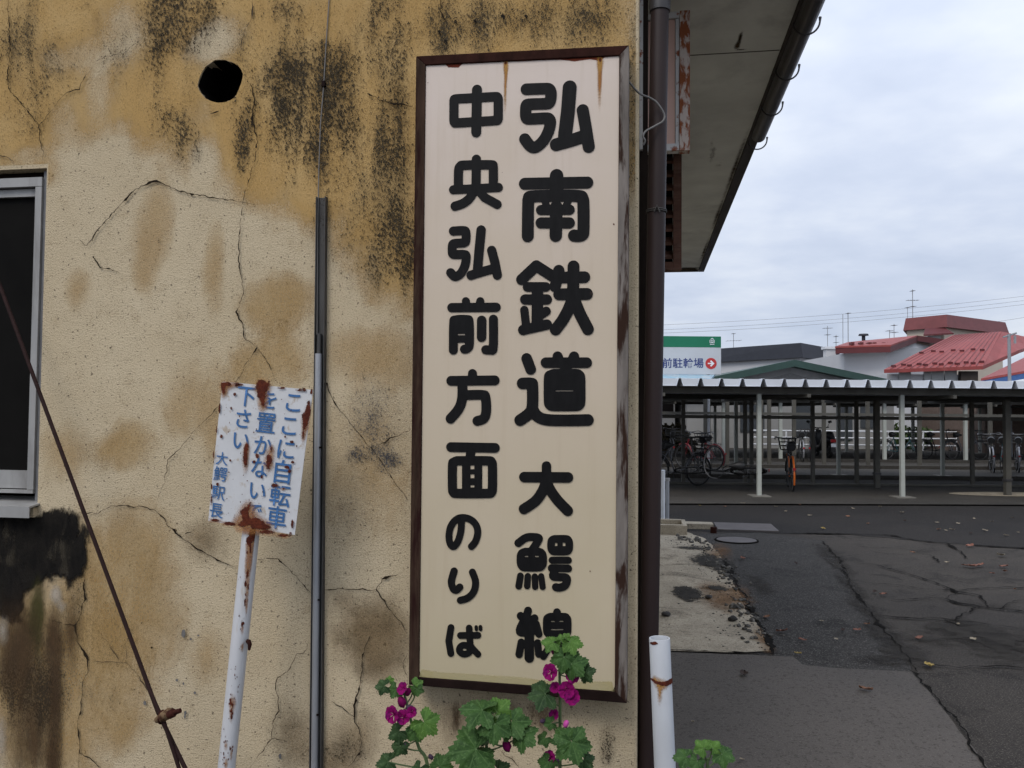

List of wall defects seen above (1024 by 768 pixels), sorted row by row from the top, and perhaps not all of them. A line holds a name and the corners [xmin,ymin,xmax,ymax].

crack [80,84,282,385]
damp [0,0,636,305]
damp [0,507,162,768]
crack [54,573,148,768]
crack [80,408,408,675]
crack [254,642,309,762]
crack [332,635,371,767]
crack [326,382,408,501]